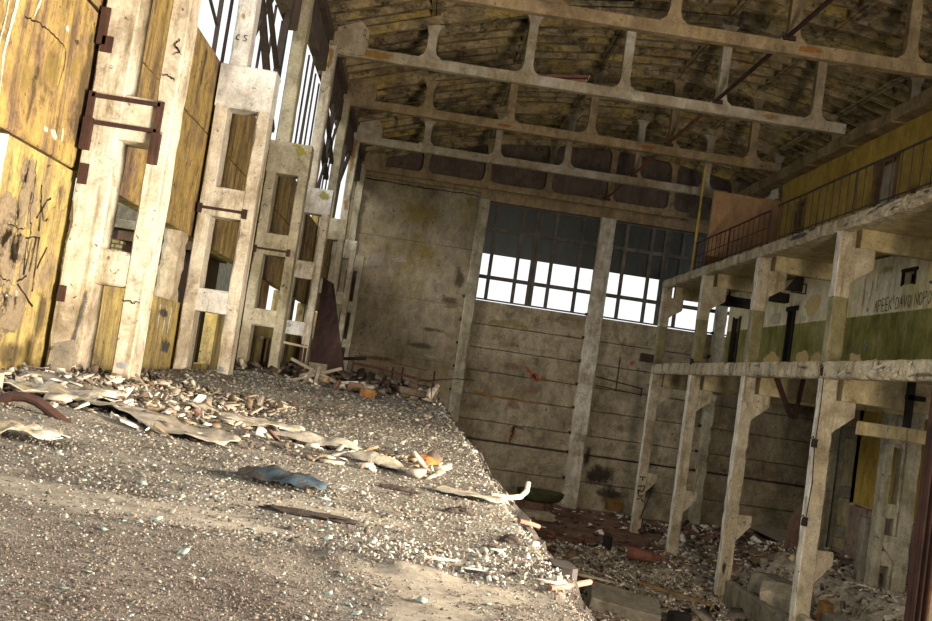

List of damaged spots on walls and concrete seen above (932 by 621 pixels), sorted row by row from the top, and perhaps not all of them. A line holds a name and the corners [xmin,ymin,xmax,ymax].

crack [25,16,66,80]
peeling [0,155,38,334]